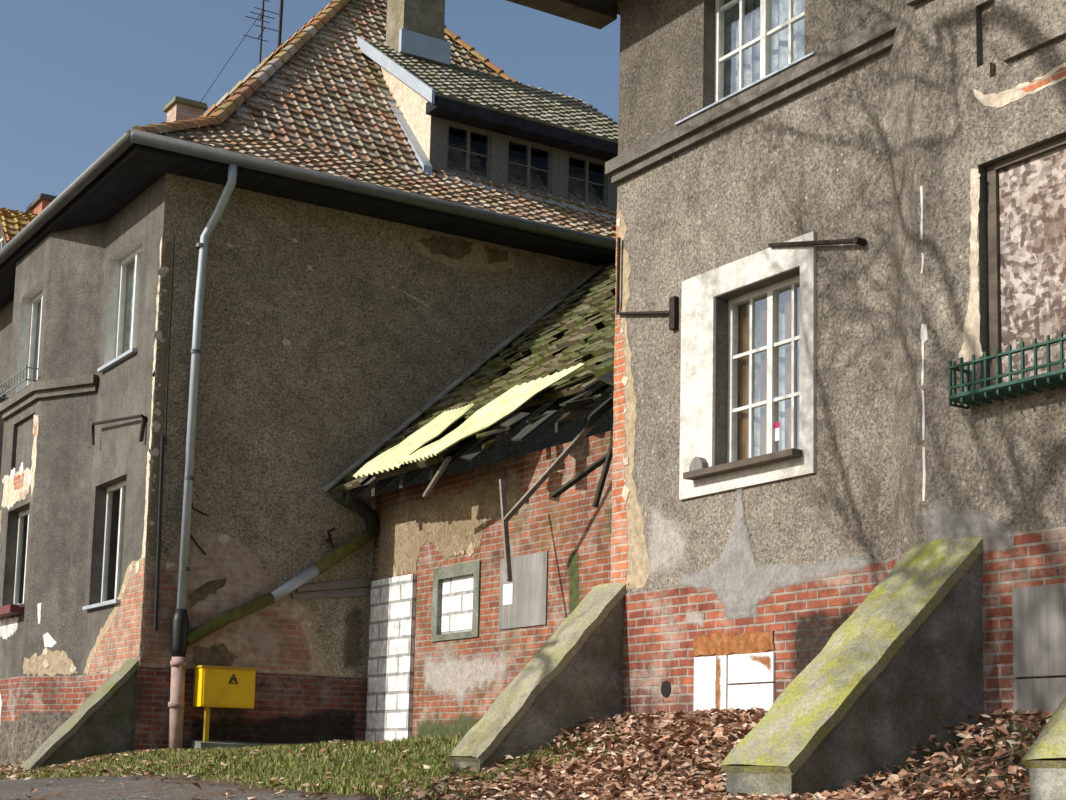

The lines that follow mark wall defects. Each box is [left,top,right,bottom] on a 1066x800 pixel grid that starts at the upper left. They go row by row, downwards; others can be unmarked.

flaking render [973,62,1066,108]
flaking render [958,168,984,374]
flaking render [0,415,39,532]
flaking render [23,238,335,676]
flaking render [0,615,19,640]
water stain [192,711,355,744]